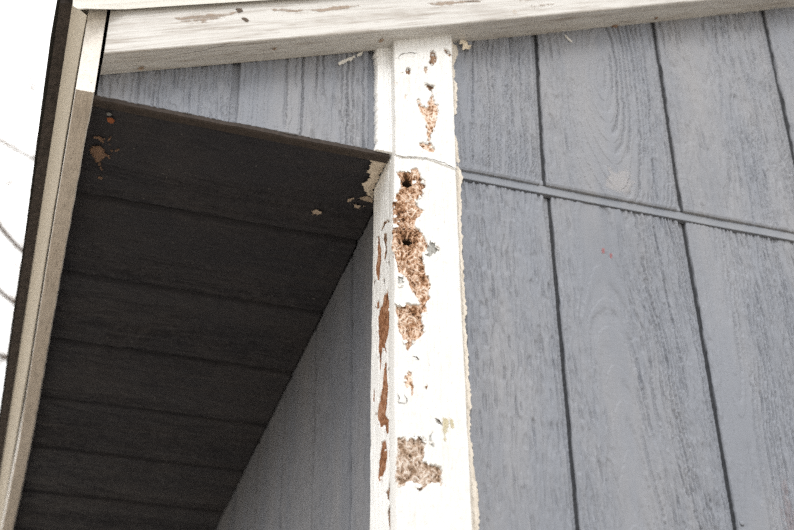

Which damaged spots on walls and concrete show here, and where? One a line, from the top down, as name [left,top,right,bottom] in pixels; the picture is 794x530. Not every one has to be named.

peeling [424,49,453,87]
peeling [417,96,438,153]
peeling [373,168,442,528]